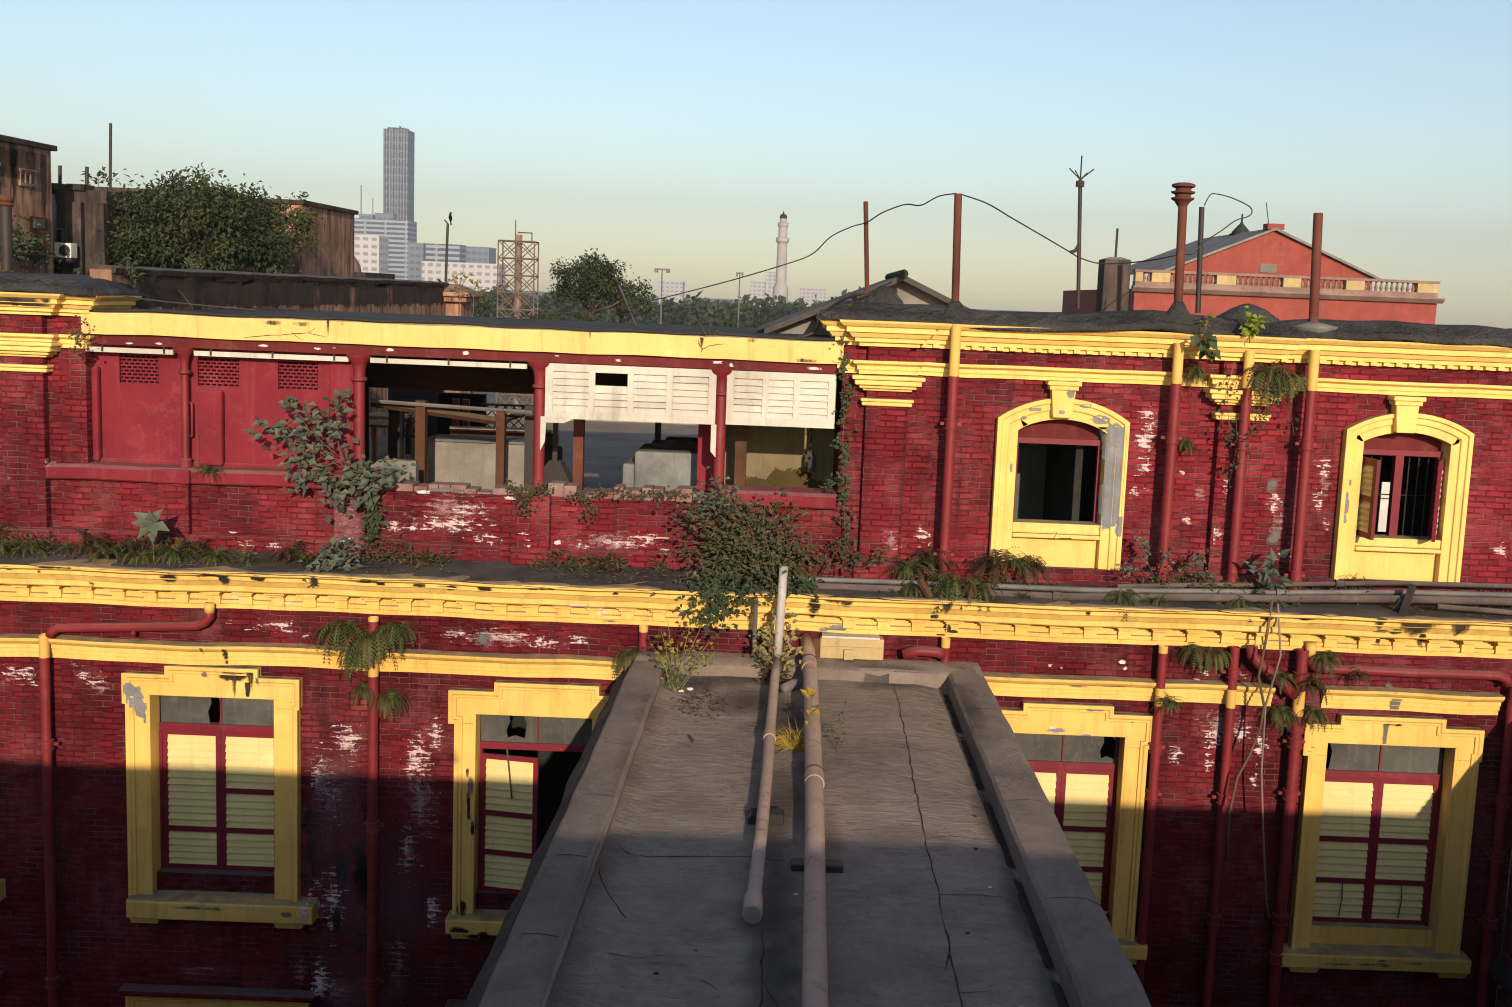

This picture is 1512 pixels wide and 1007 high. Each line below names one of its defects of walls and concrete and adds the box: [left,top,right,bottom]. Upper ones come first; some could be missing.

peeling [1059,390,1128,537]
peeling [123,682,147,723]
crack [894,685,1009,1007]